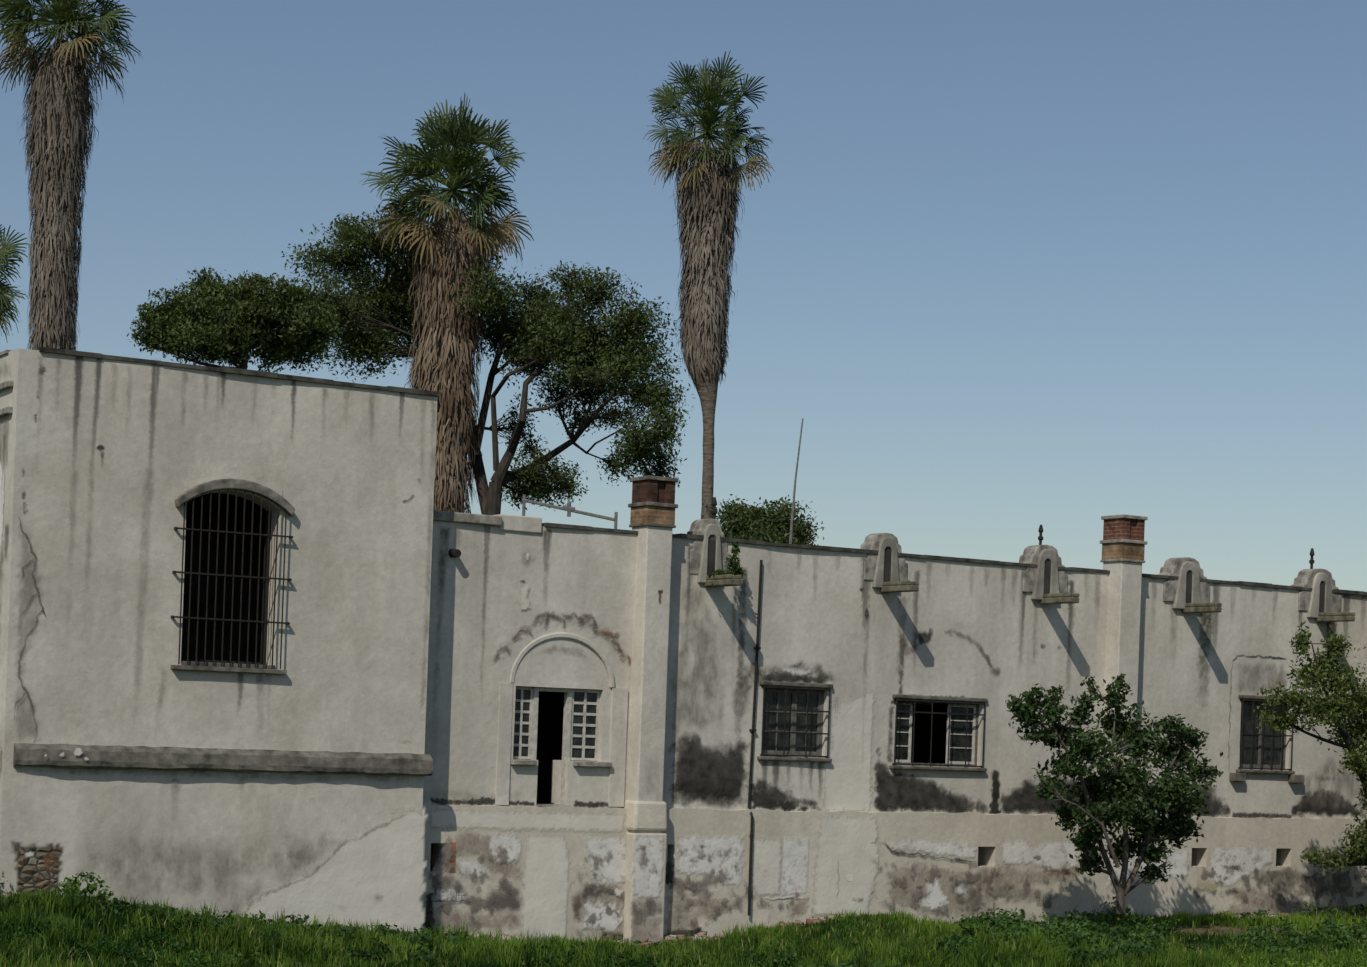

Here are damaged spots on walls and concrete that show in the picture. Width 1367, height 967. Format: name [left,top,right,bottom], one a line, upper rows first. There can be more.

water stain [75,356,101,401]
crack [20,523,46,622]
flaking render [493,552,630,664]
crack [15,664,32,705]
water stain [875,629,1103,814]
water stain [673,736,816,811]
flaking render [12,842,62,895]
flaking render [424,833,521,931]
flaking render [880,840,1080,918]
peeling [1106,848,1367,915]